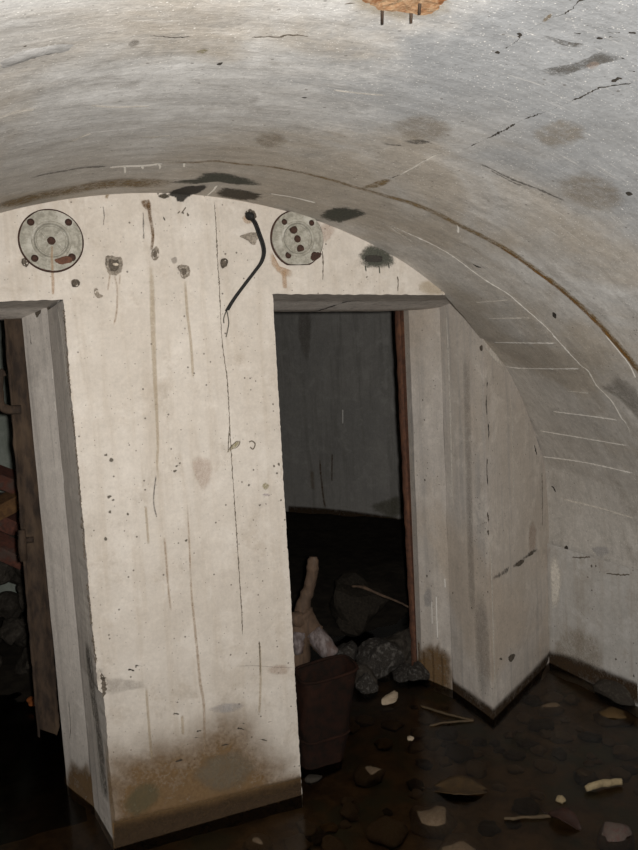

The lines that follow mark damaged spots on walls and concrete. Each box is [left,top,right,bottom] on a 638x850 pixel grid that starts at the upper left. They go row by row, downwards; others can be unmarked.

spalling [346,0,446,25]
crack [495,0,583,54]
crack [471,77,631,146]
corrosion [18,209,84,293]
corrosion [142,201,154,249]
damp [159,173,261,202]
damp [321,207,364,223]
crack [366,153,444,188]
corrosion [267,166,638,378]
crack [214,205,243,631]
damp [68,567,302,850]
damp [452,653,638,729]